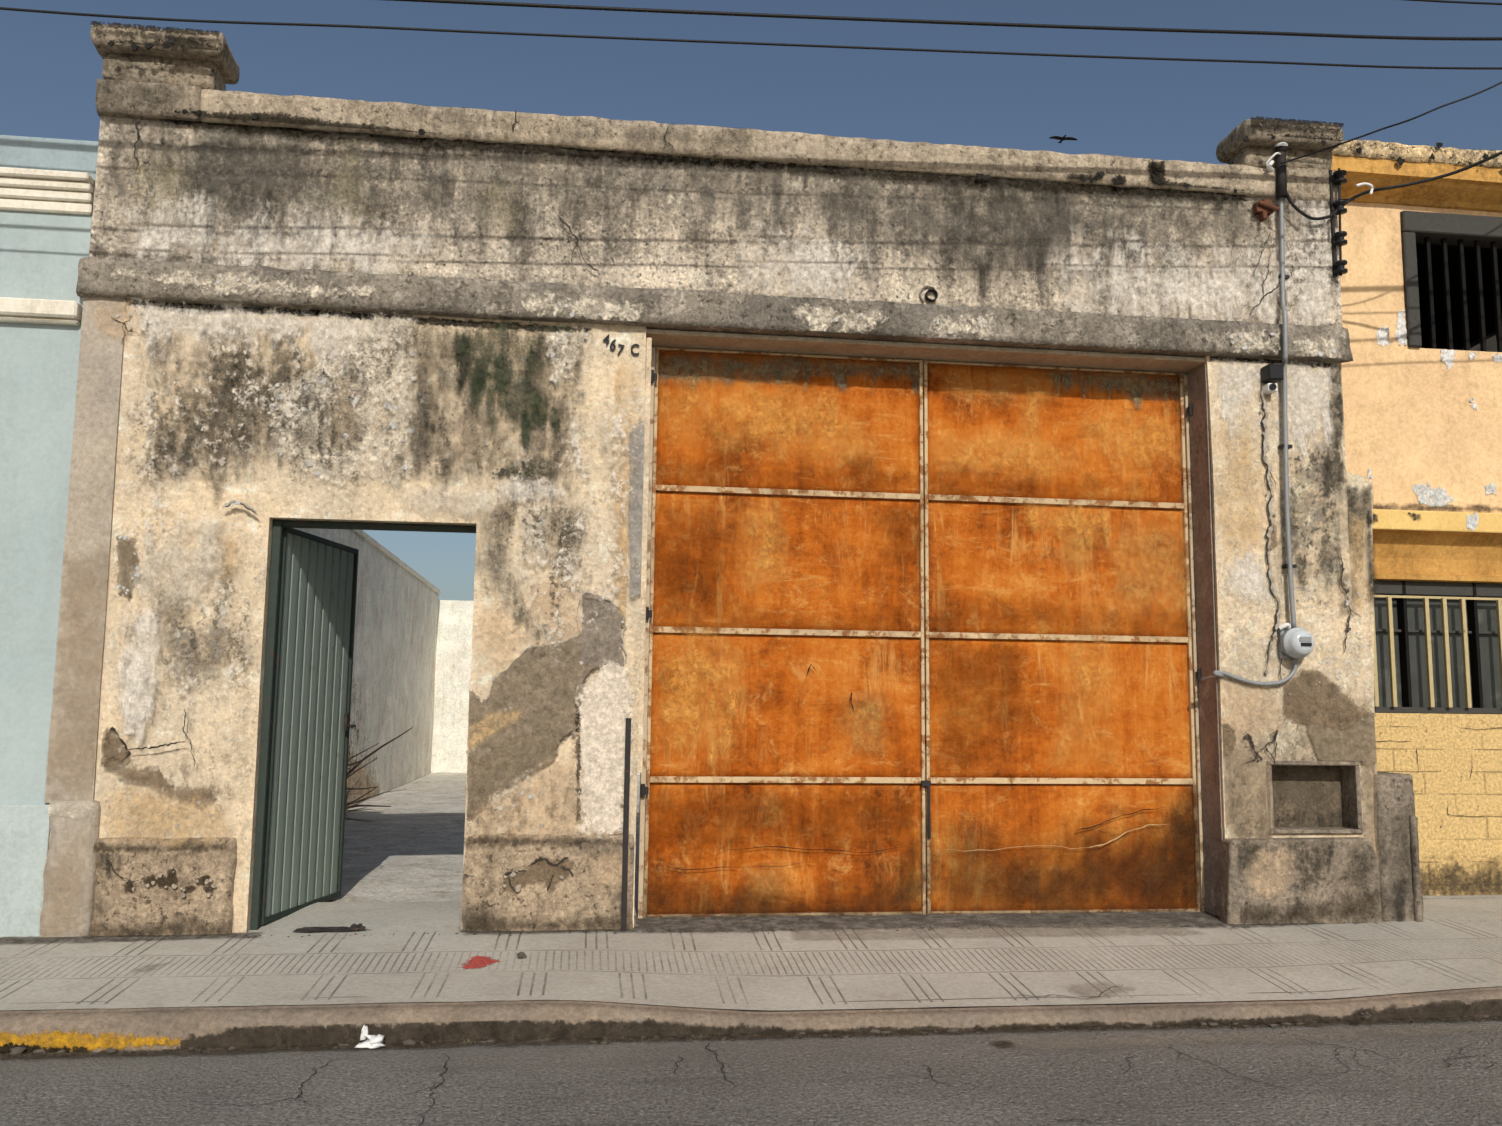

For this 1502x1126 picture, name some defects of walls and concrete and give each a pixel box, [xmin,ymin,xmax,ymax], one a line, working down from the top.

crack [1250,230,1280,314]
damp [95,119,1247,659]
crack [1259,390,1282,691]
crack [1340,554,1361,652]
spalling [101,727,131,767]
damp [469,723,575,838]
flaking render [466,592,625,821]
rust [663,645,736,760]
crack [1244,730,1278,765]
damp [1223,669,1377,766]
spalling [124,865,216,898]
spalling [502,857,573,894]